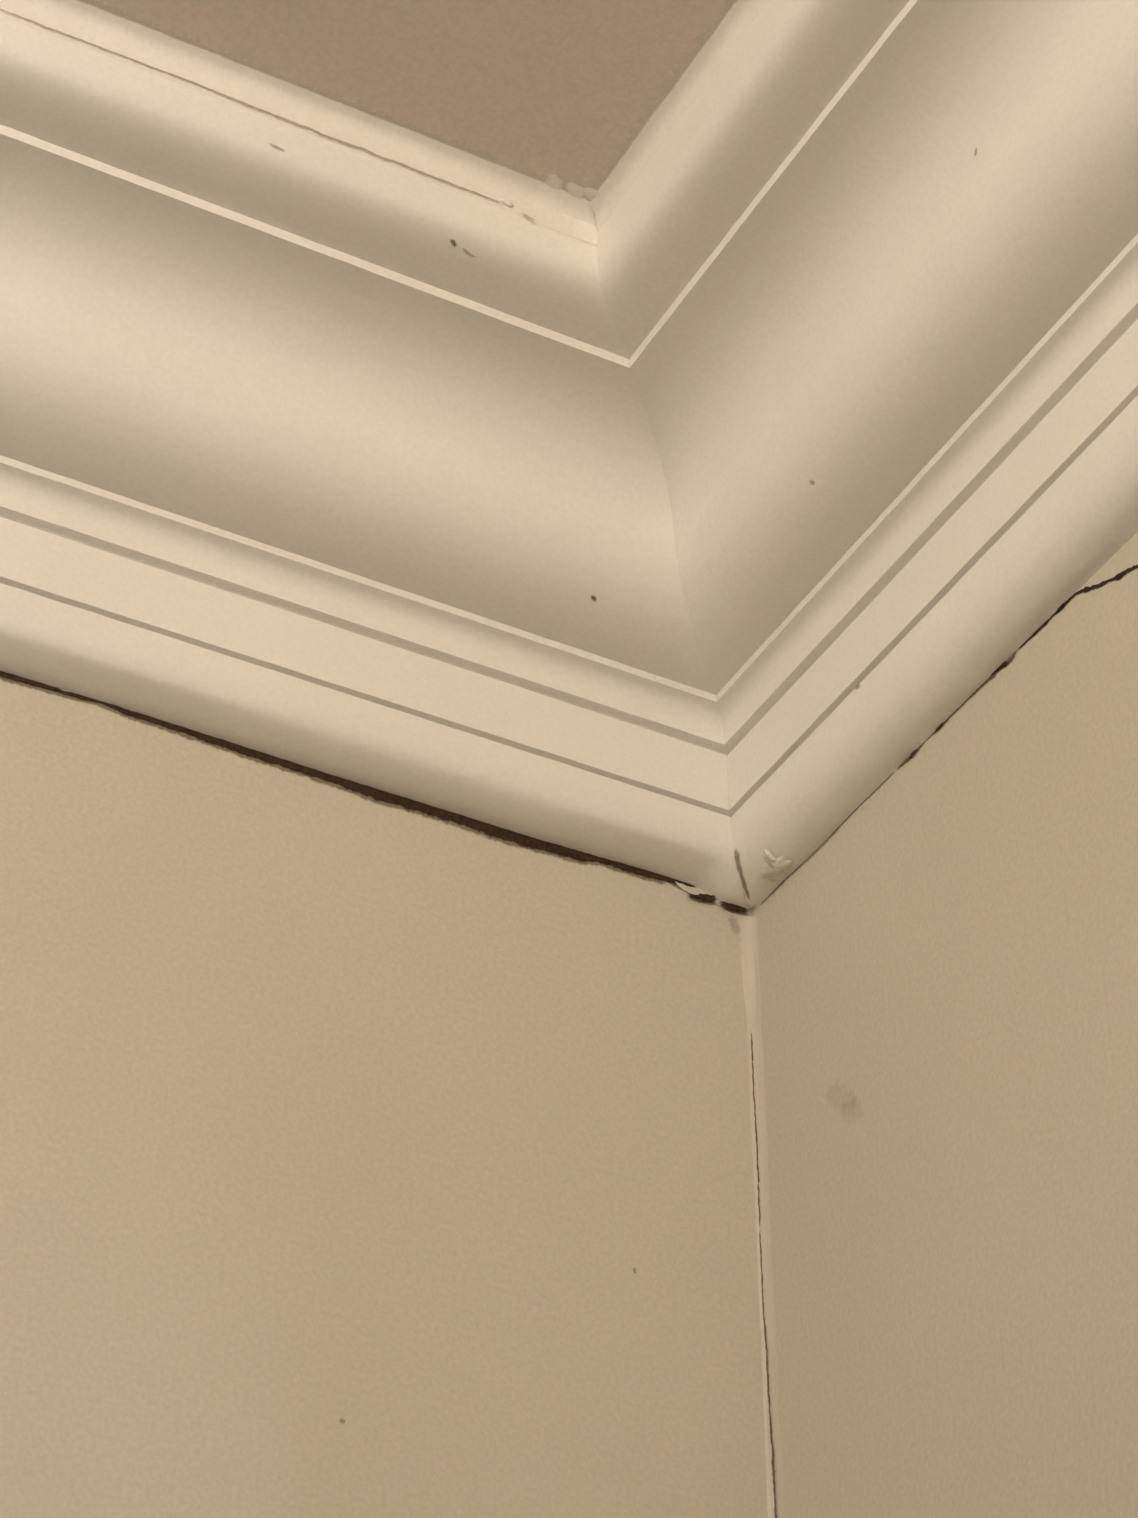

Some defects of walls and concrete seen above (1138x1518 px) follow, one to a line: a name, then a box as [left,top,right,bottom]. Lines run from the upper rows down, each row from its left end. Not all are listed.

crack [0,671,695,891]
crack [735,565,1138,903]
crack [751,1034,777,1518]